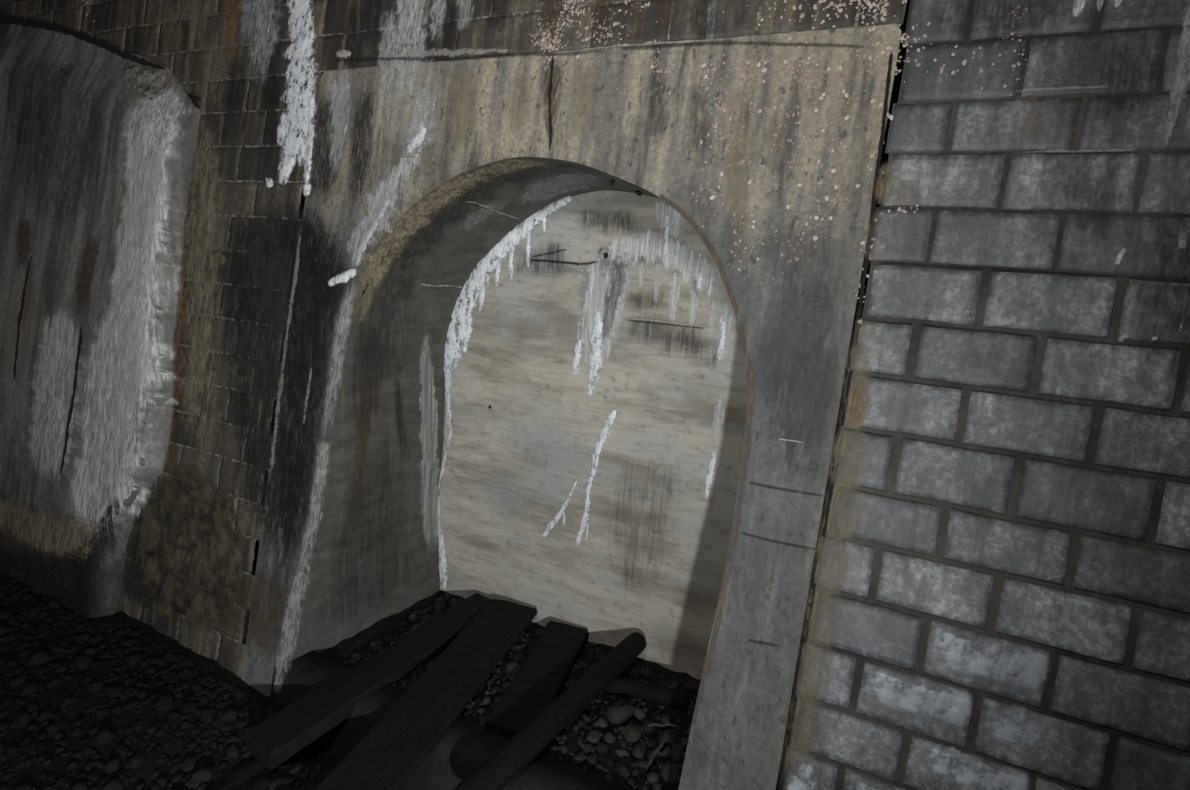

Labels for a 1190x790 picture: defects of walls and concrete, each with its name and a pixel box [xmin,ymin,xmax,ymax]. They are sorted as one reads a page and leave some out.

crack [337,50,351,58]
crack [543,58,562,150]
crack [585,40,700,50]
leakage [0,89,224,618]
leakage [226,443,328,692]
leakage [241,0,594,589]
leakage [541,410,616,545]
leakage [573,202,732,396]
leakage [705,398,724,498]
leakage [772,250,840,469]